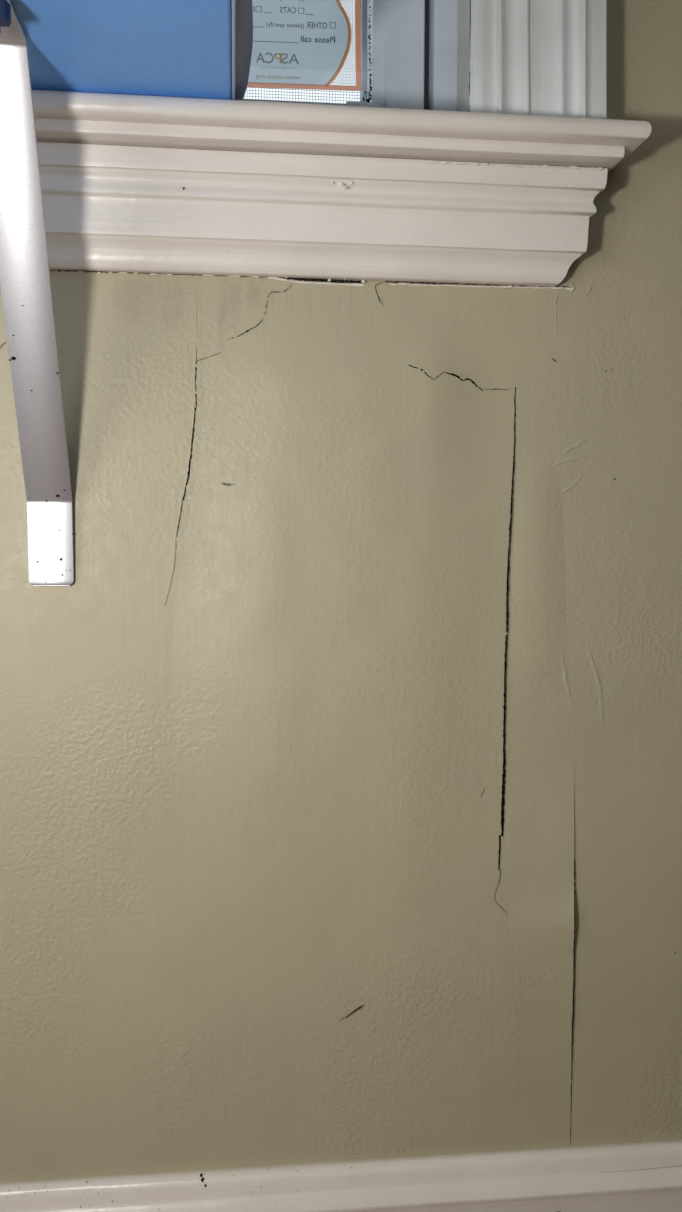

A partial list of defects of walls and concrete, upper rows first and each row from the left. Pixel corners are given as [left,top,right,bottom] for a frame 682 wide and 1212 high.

crack [163,285,291,606]
crack [409,364,516,908]
crack [569,864,577,1145]